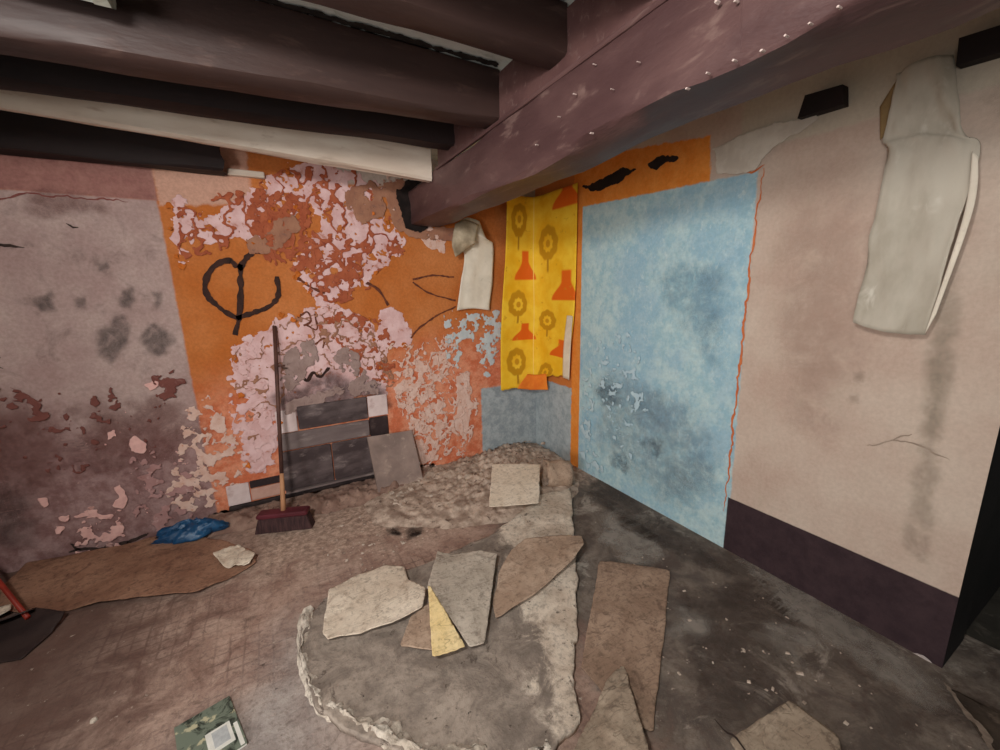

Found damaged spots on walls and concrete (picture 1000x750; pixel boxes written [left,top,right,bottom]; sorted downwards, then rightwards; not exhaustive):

damp [99,328,127,357]
damp [144,325,168,354]
peeling [164,162,501,474]
flaking render [0,387,156,474]
flaking render [144,370,186,423]
peeling [55,485,128,553]